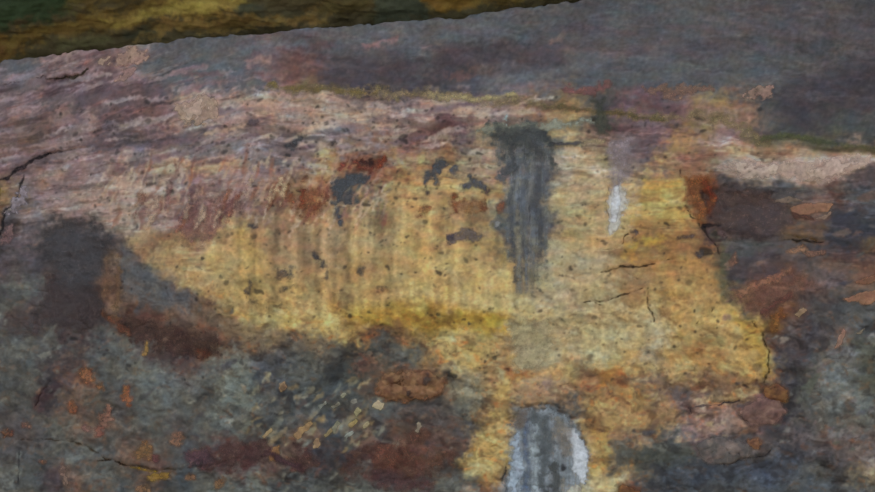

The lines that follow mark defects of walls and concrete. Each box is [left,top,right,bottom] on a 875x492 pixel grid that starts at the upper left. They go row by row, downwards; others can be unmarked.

crack [0,151,62,235]
corrosion [339,155,387,173]
damp [266,81,875,294]
corrosion [688,175,717,220]
damp [28,214,112,334]
corrosion [101,255,219,359]
corrosion [134,440,169,492]
corrosion [169,432,320,490]
damp [505,404,588,492]